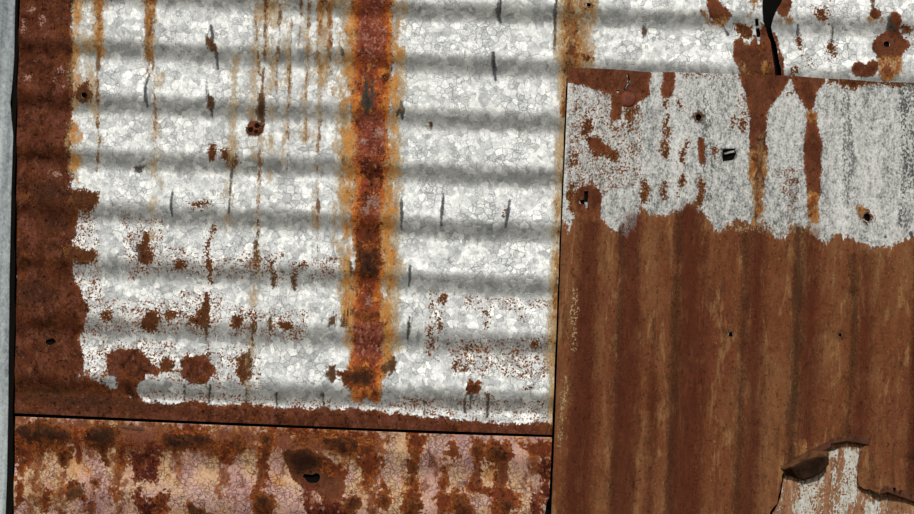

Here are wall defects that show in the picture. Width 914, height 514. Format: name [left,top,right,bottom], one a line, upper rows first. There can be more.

corrosion [14,0,552,514]
corrosion [446,0,914,514]